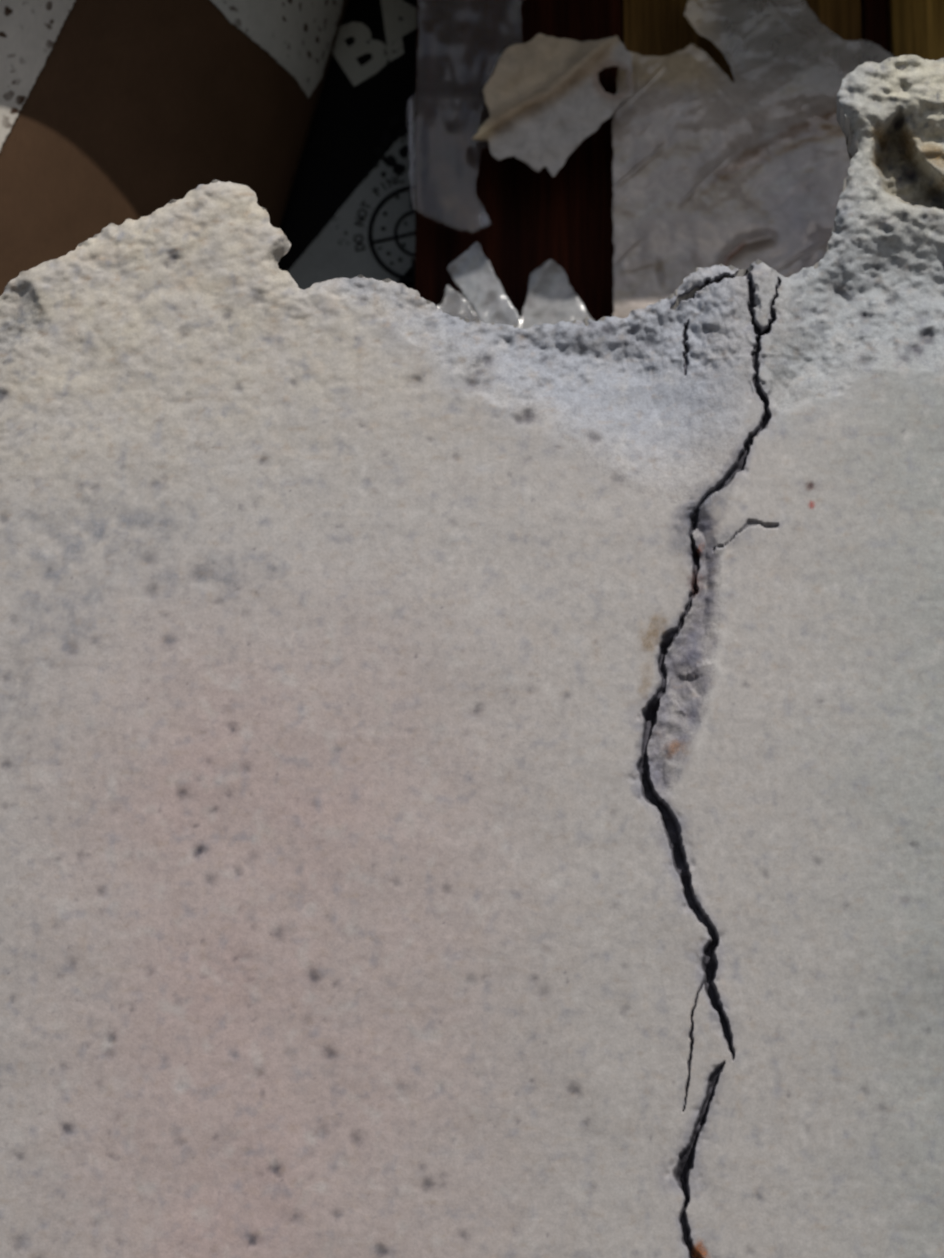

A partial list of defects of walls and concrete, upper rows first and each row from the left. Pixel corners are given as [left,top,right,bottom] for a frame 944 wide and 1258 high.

crack [637,266,781,1258]